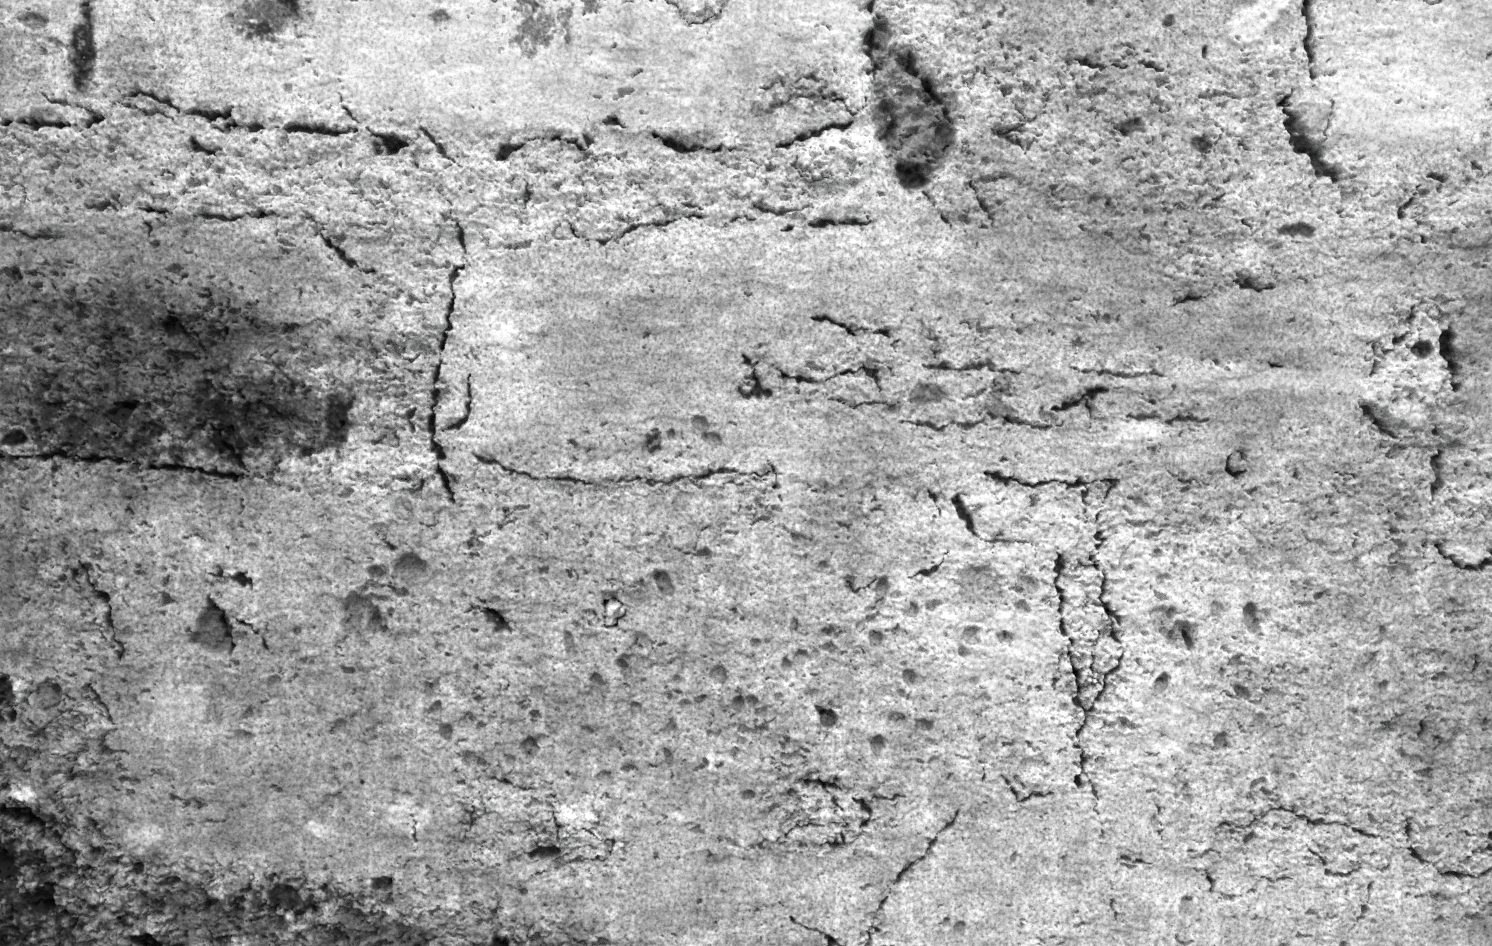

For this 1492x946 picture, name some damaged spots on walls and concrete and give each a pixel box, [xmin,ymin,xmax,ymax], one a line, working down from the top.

crack [0,81,361,158]
crack [417,0,1031,249]
crack [1298,0,1336,146]
crack [381,220,780,507]
crack [736,312,1251,489]
crack [1266,358,1286,371]
crack [1289,468,1357,483]
crack [773,468,1168,946]
crack [1416,718,1428,742]
crack [1469,651,1483,682]
crack [1196,864,1217,898]
crack [1215,800,1492,930]